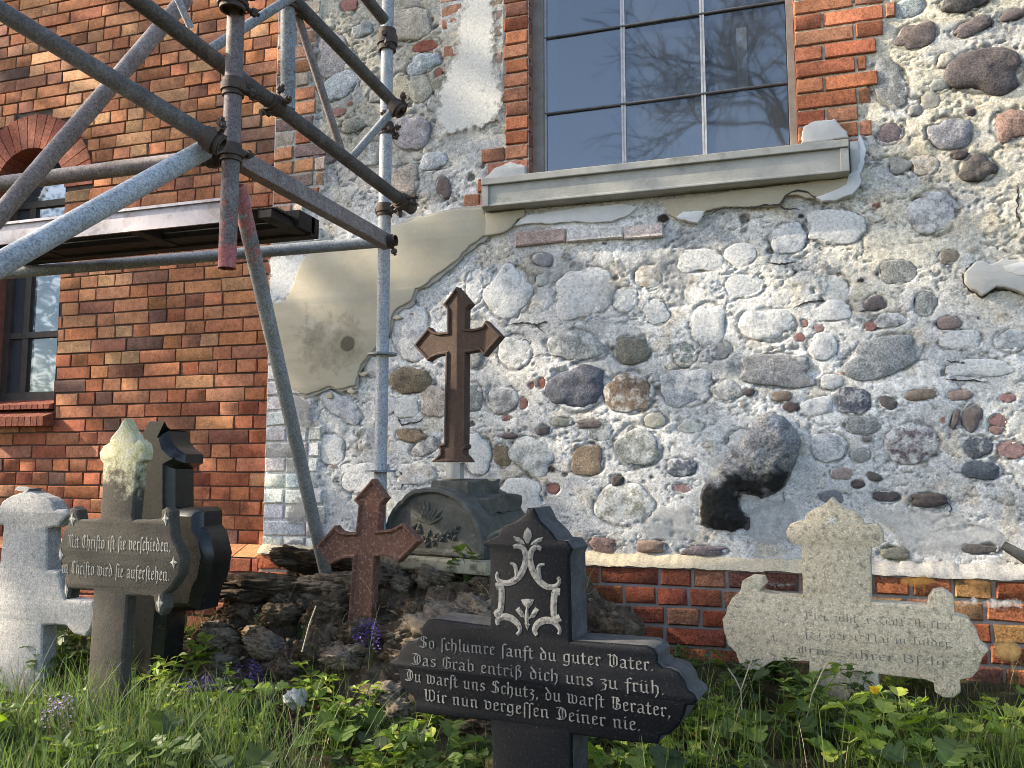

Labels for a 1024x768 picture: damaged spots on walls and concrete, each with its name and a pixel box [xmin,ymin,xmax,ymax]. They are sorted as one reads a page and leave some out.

peeling [435,0,503,137]
flaking render [657,135,867,224]
damp [332,332,354,352]
peeling [269,204,637,431]
peeling [964,259,1024,296]